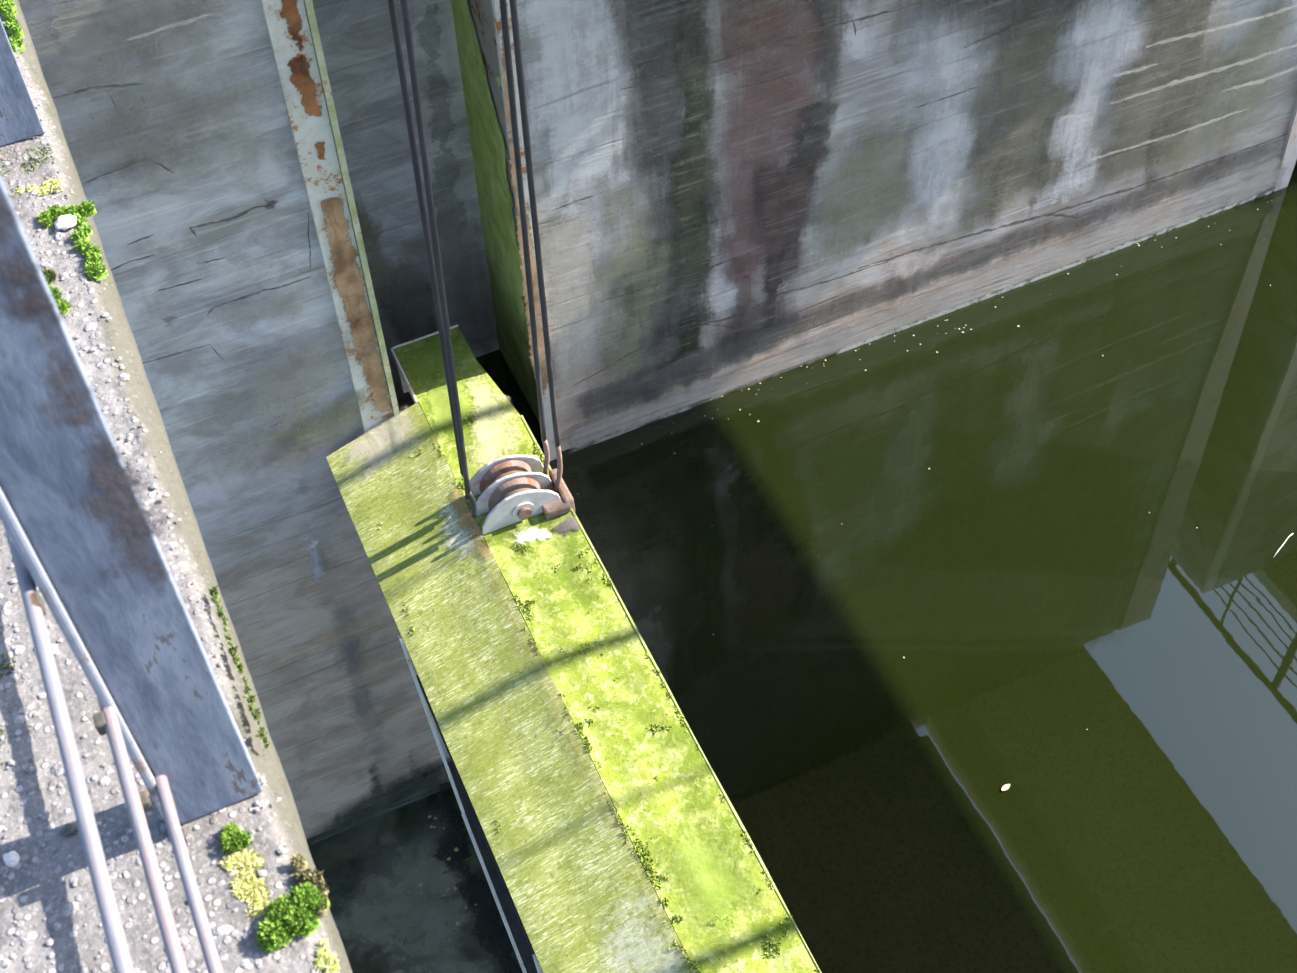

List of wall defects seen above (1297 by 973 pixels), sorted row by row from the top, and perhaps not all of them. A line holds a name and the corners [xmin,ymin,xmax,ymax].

rust [280,0,322,117]
rust [0,200,16,240]
rust [0,252,94,426]
crack [83,159,174,184]
crack [111,234,155,270]
crack [142,204,311,364]
rust [315,142,325,160]
rust [321,198,391,412]
water stain [517,0,1284,448]
rust [80,441,178,581]